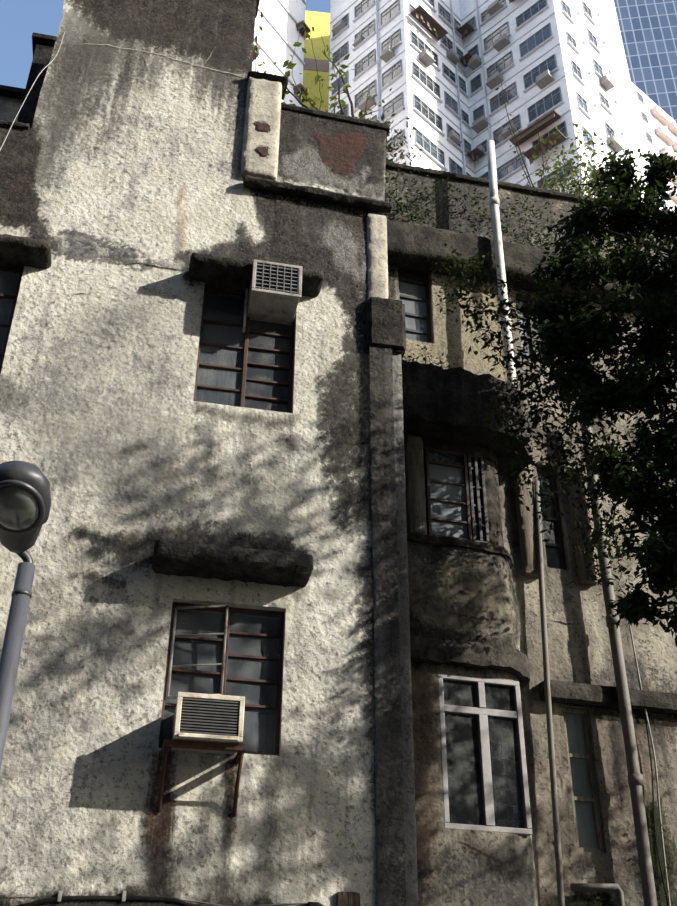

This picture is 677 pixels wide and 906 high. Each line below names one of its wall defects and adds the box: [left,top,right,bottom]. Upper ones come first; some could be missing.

damp [0,0,256,259]
spalling [255,120,271,131]
spalling [256,145,270,156]
spalling [315,132,370,186]
damp [146,520,317,566]
damp [175,188,523,906]
rust [143,749,176,888]
damp [147,848,181,906]